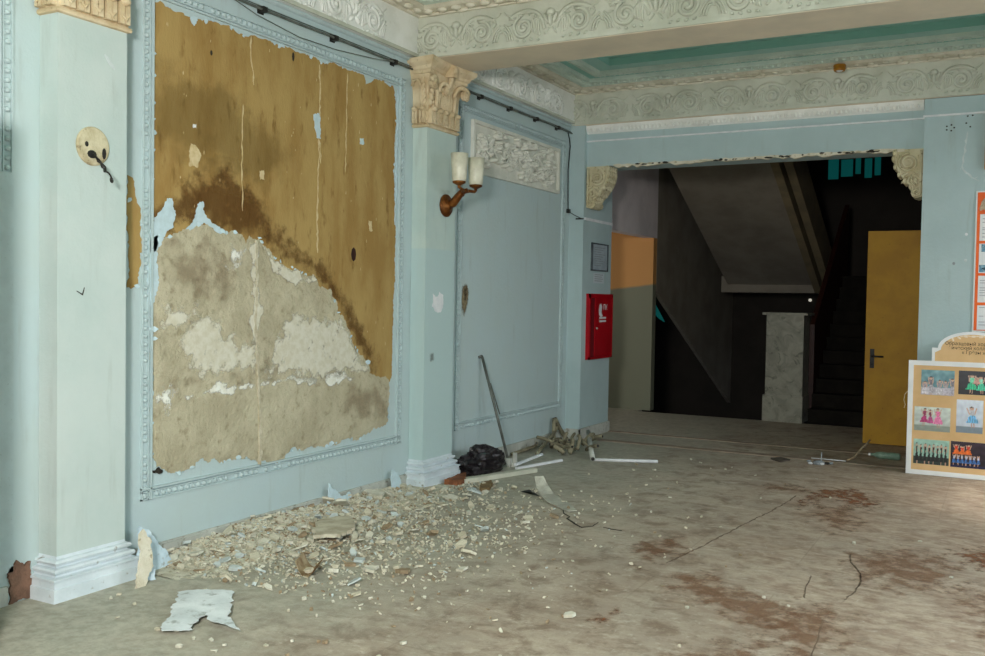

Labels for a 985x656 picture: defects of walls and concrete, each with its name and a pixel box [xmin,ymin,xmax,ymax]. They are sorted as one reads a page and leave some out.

damp [173,169,336,295]
peeling [126,1,398,475]
damp [346,309,370,356]
crack [844,554,862,600]